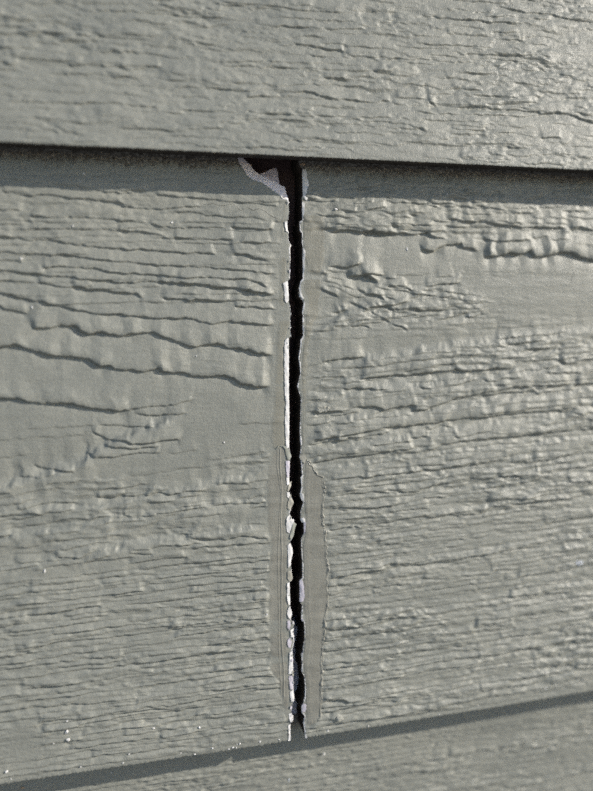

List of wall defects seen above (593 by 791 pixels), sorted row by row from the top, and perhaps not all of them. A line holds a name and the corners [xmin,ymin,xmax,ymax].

crack [206,157,295,518]
spalling [238,158,289,204]
peeling [276,169,309,741]